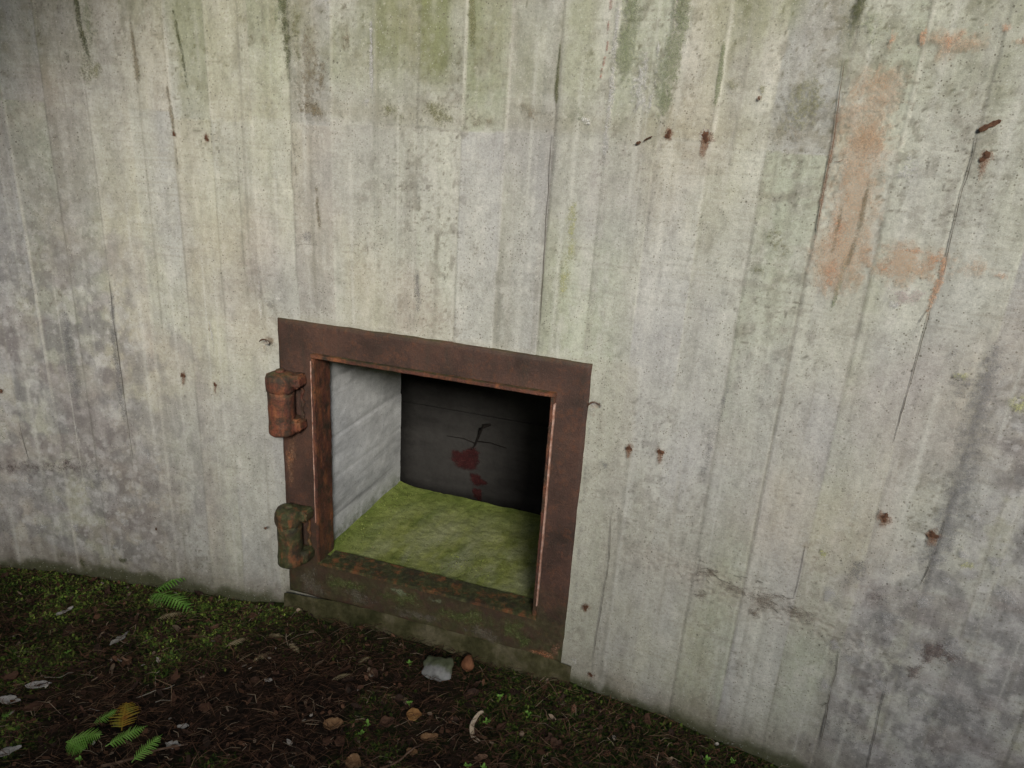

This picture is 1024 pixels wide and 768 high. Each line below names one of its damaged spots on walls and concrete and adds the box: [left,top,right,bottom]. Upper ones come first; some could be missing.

corrosion [979,119,1001,132]
corrosion [699,129,714,156]
corrosion [977,150,993,179]